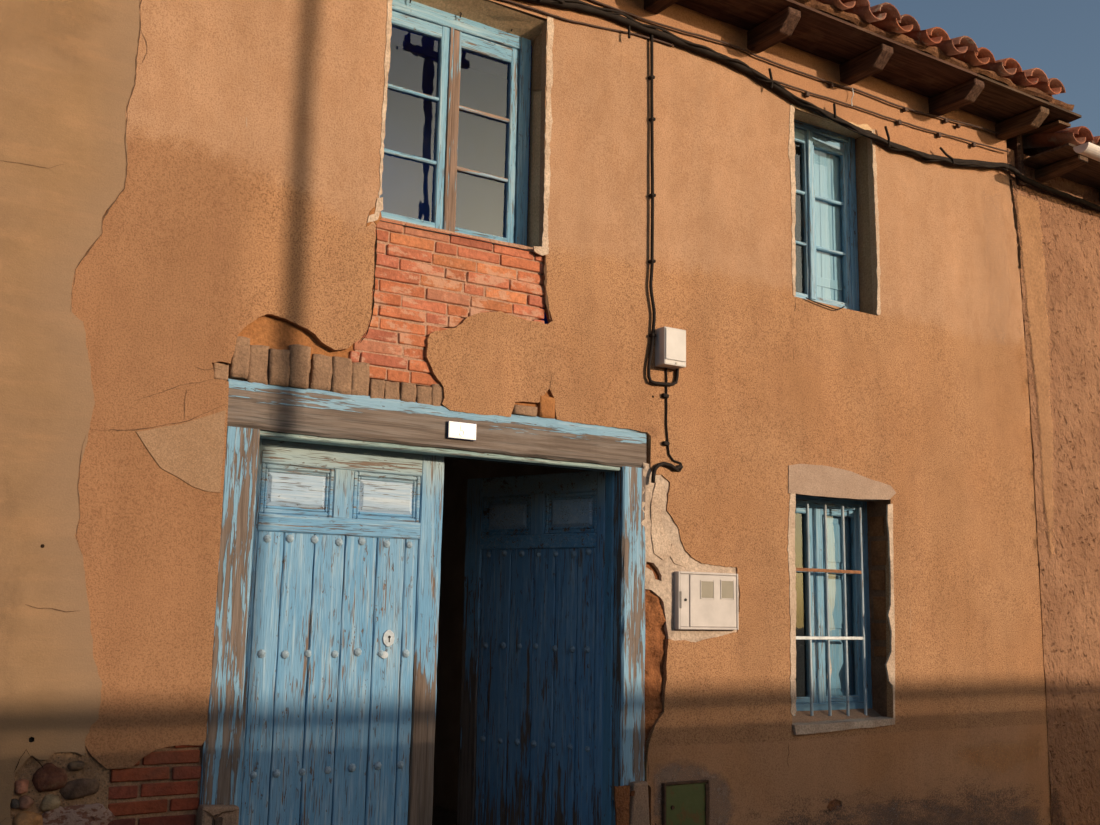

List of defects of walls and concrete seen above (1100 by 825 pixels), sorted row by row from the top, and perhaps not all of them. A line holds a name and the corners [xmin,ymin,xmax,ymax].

flaking render [238,0,554,386]
crack [76,366,225,554]
spalling [641,463,737,755]
flaking render [108,744,203,825]
damp [656,765,729,825]
damp [777,790,1044,825]